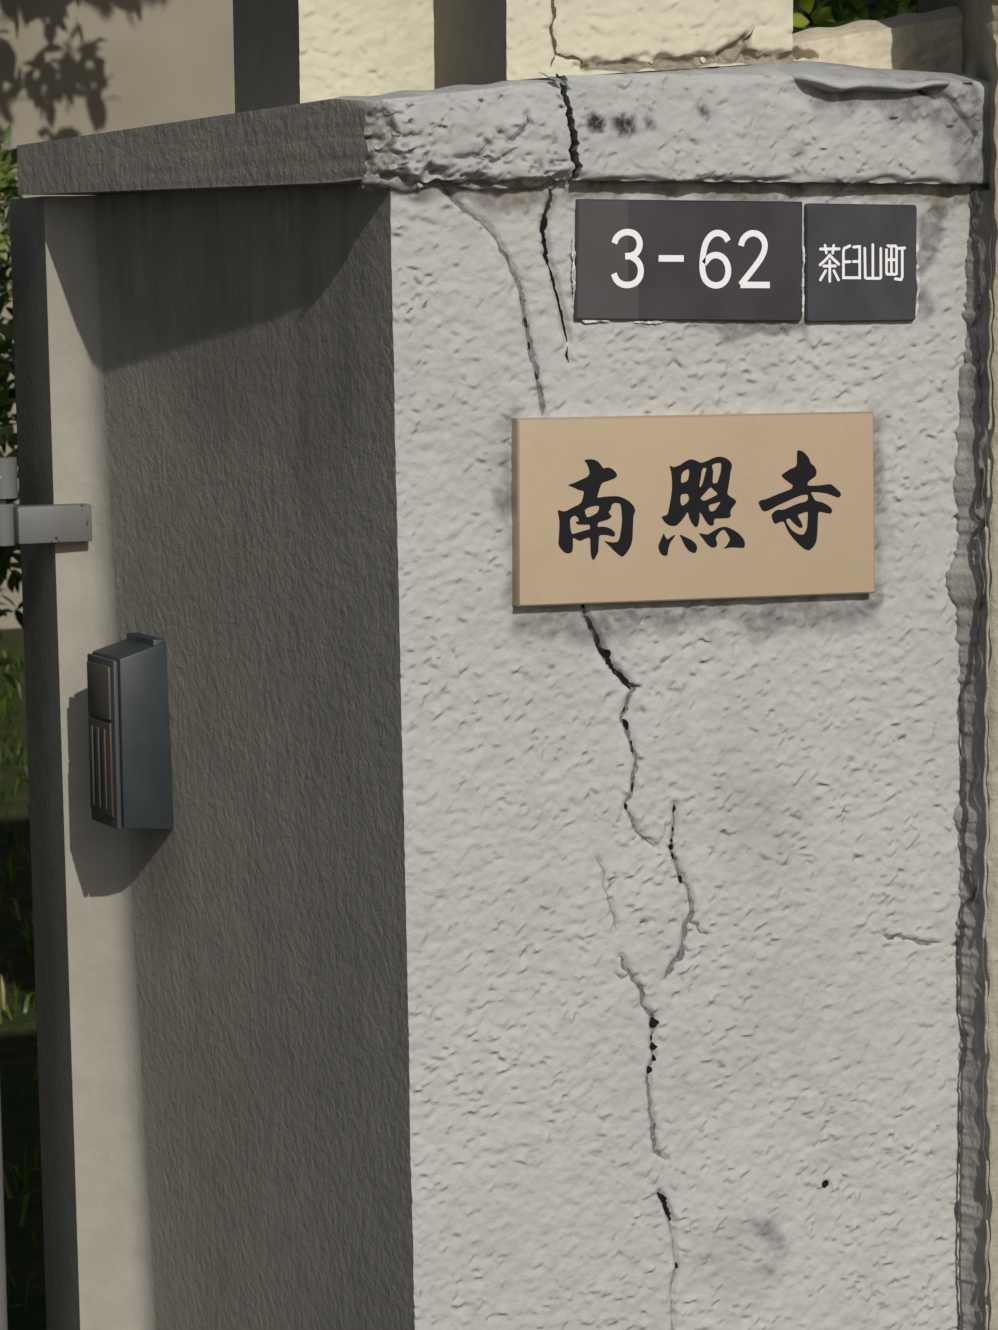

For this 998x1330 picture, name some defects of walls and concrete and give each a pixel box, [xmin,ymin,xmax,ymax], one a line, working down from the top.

crack [442,0,583,416]
crack [581,604,709,1159]
crack [883,187,985,1330]
crack [657,1192,678,1330]